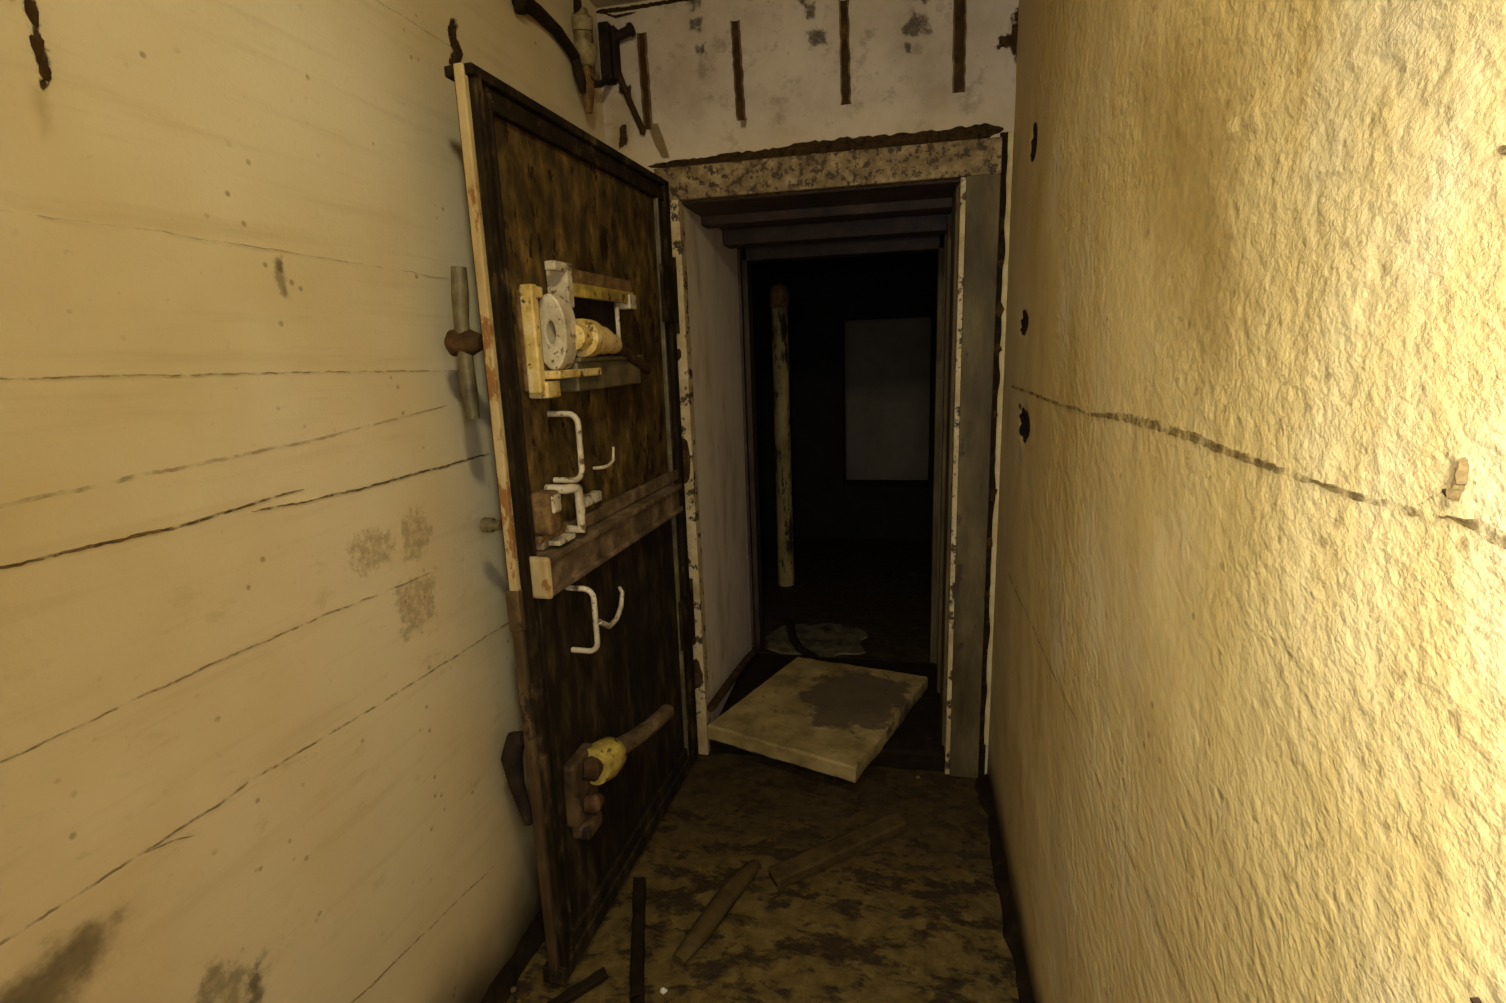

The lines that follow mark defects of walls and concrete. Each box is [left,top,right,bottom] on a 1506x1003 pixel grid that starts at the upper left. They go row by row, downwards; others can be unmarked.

crack [0,453,489,569]
crack [1012,385,1506,549]
damp [0,925,100,1003]